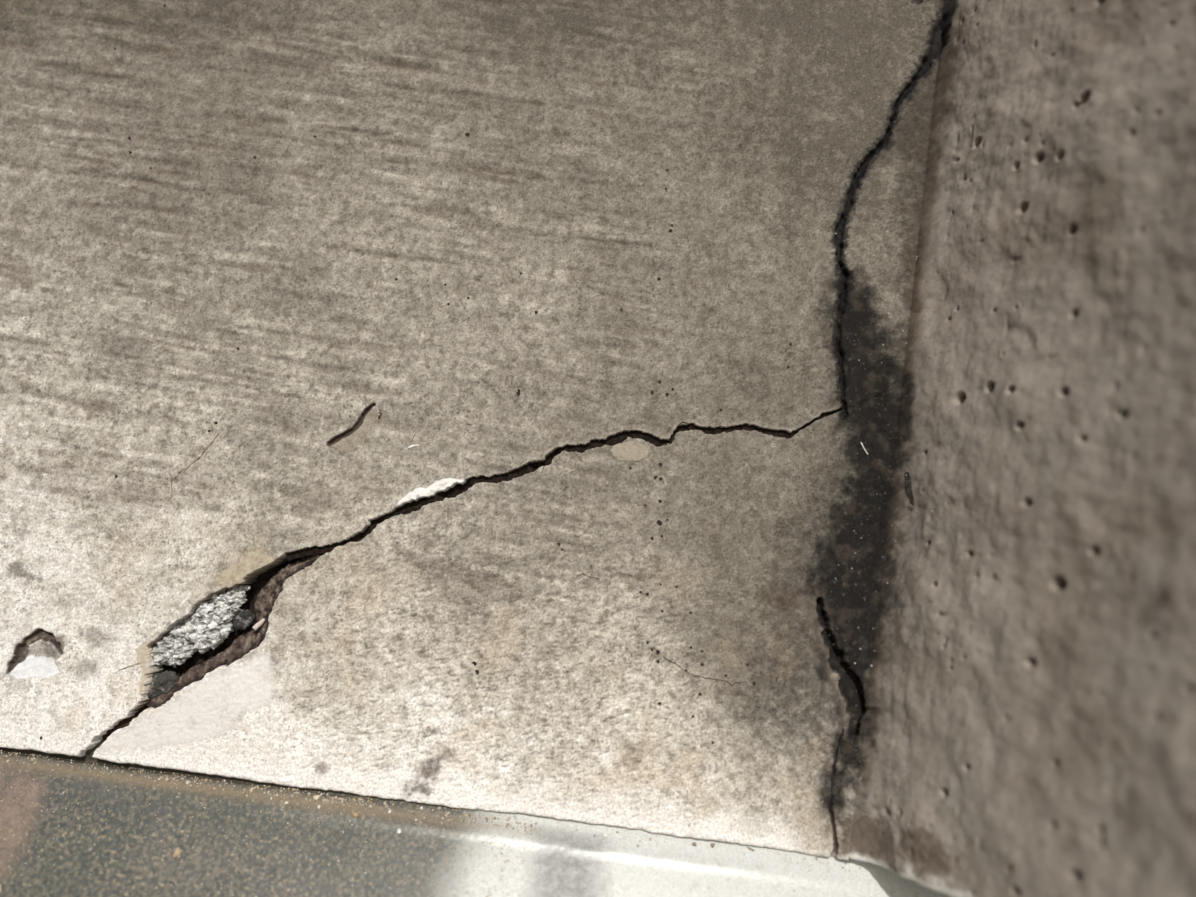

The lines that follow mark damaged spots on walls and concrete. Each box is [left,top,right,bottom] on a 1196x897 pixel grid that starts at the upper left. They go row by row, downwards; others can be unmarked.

crack [287,0,958,561]
crack [171,434,220,491]
crack [577,572,644,582]
leakage [807,271,949,871]
spalling [9,630,64,680]
flaking render [99,549,324,753]
crack [654,648,754,686]
crack [102,700,151,740]